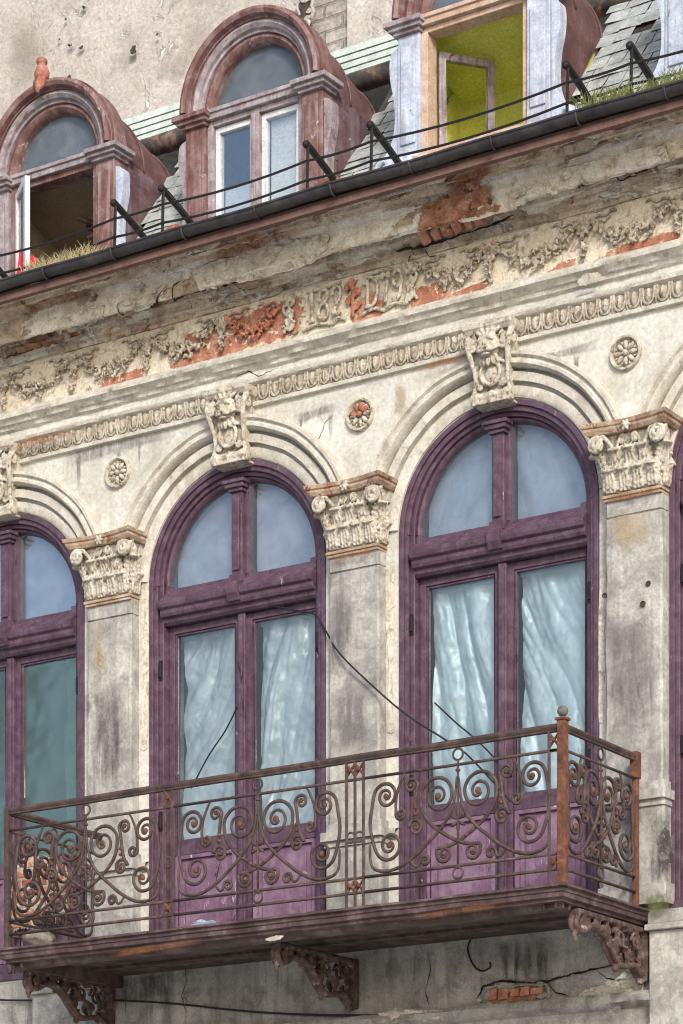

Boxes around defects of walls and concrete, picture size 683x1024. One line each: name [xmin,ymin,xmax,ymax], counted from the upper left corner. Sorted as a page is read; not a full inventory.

spalling [417,142,674,246]
crack [395,215,514,263]
flaking render [602,232,681,258]
spalling [1,284,167,362]
flaking render [164,296,308,368]
flaking render [350,291,385,323]
flaking render [98,368,144,388]
flaking render [477,981,551,1005]
crack [477,965,619,998]